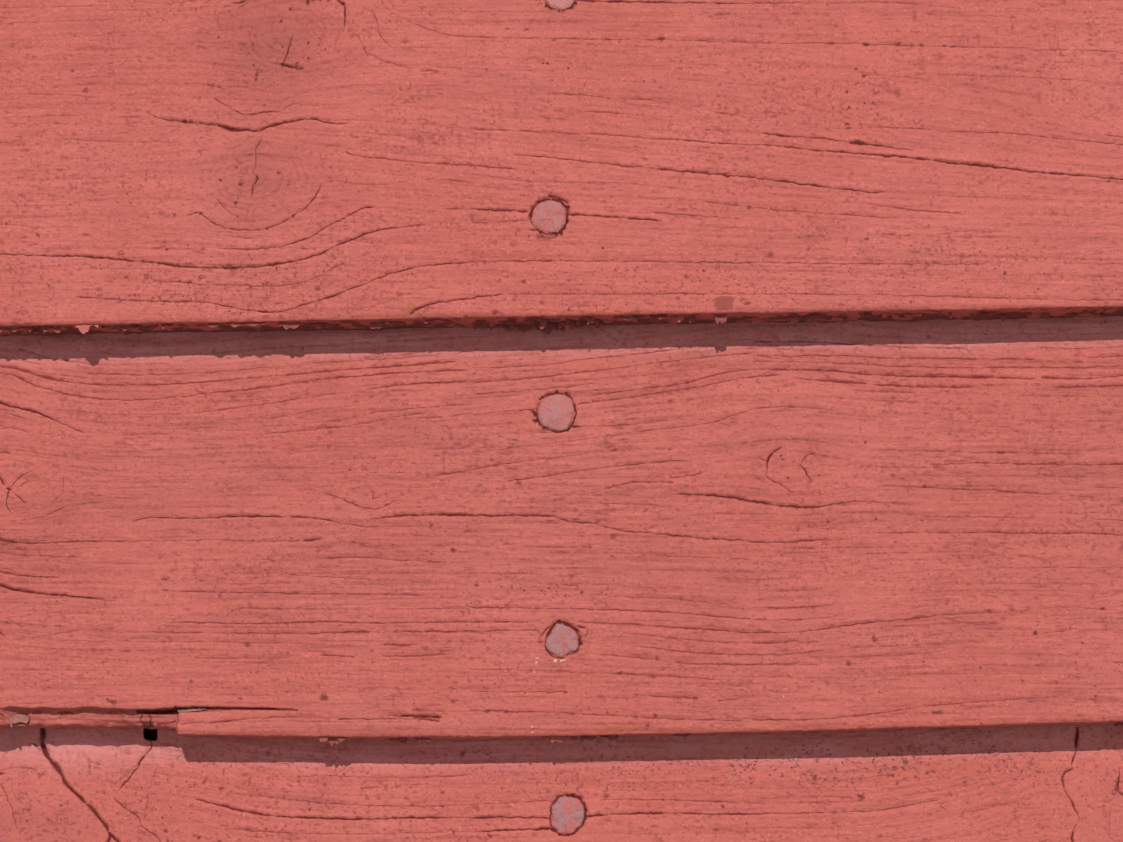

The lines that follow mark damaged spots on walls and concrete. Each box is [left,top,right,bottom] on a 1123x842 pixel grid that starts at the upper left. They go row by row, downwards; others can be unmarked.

crack [136,707,298,723]
crack [33,728,156,842]
crack [1062,727,1079,842]